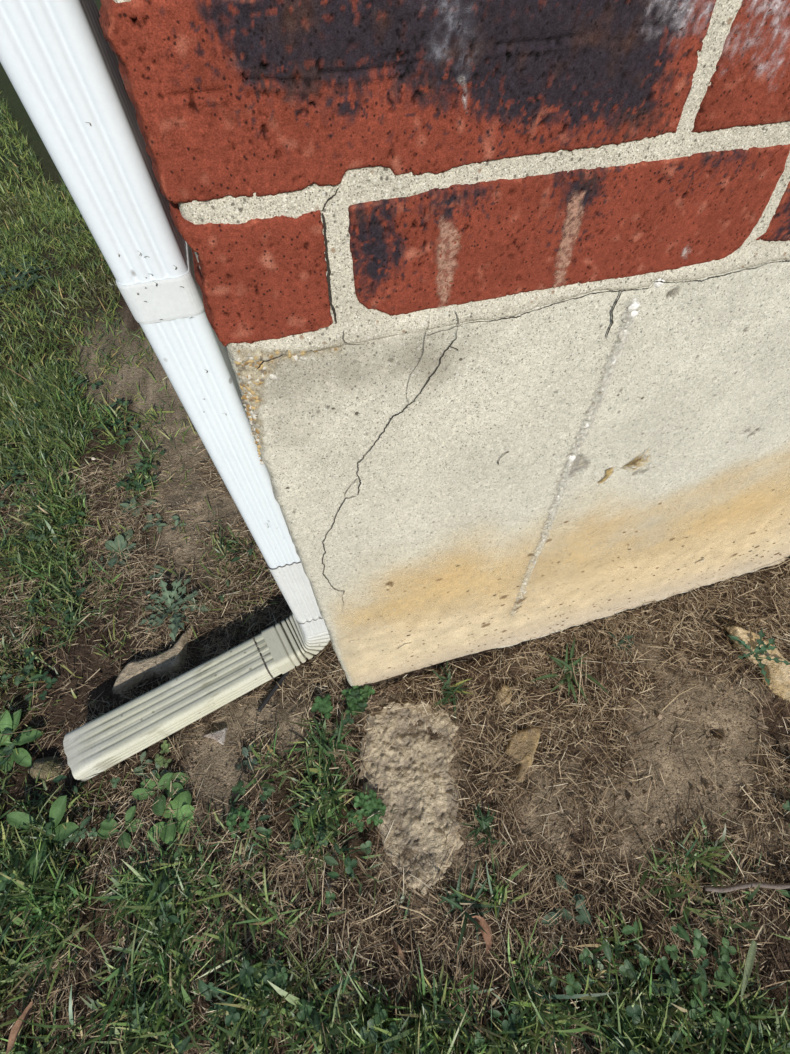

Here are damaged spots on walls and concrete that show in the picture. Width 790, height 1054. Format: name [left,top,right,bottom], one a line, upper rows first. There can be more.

crack [322,260,790,612]